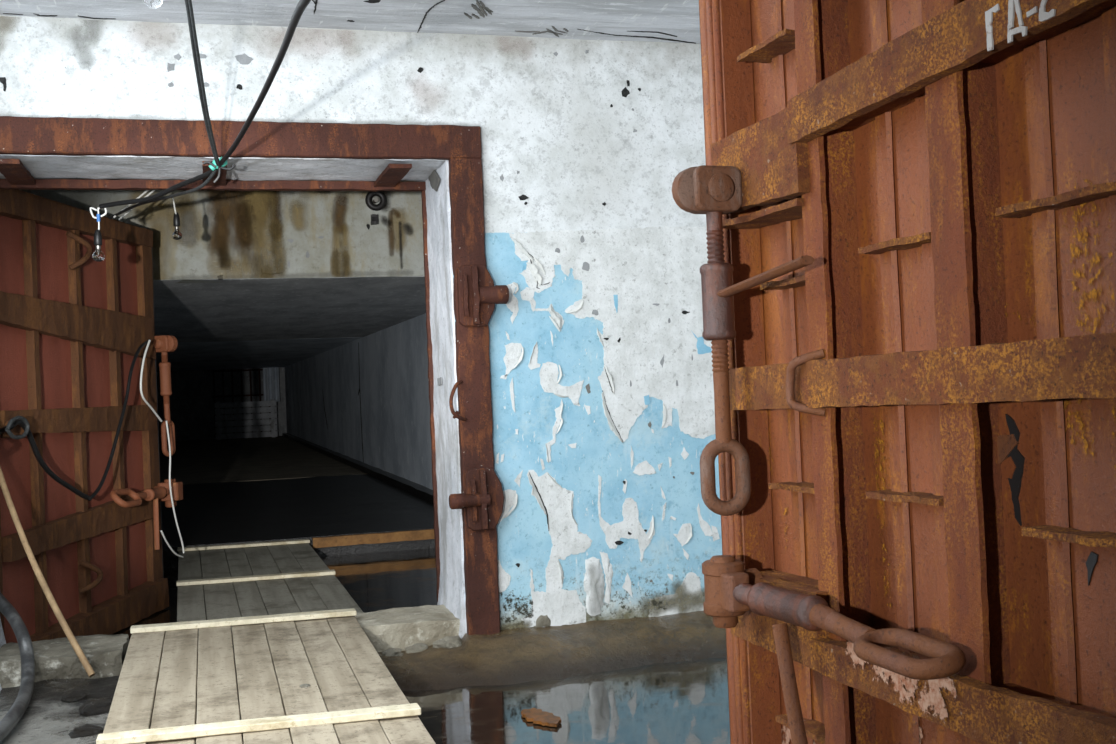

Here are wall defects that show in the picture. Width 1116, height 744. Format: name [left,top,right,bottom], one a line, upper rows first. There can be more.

damp [134,192,196,280]
corrosion [207,179,285,277]
corrosion [332,195,350,277]
corrosion [389,209,404,268]
corrosion [1062,203,1115,335]
peeling [498,226,720,628]
mould [500,592,534,630]
damp [644,584,705,615]
peeling [845,642,957,744]